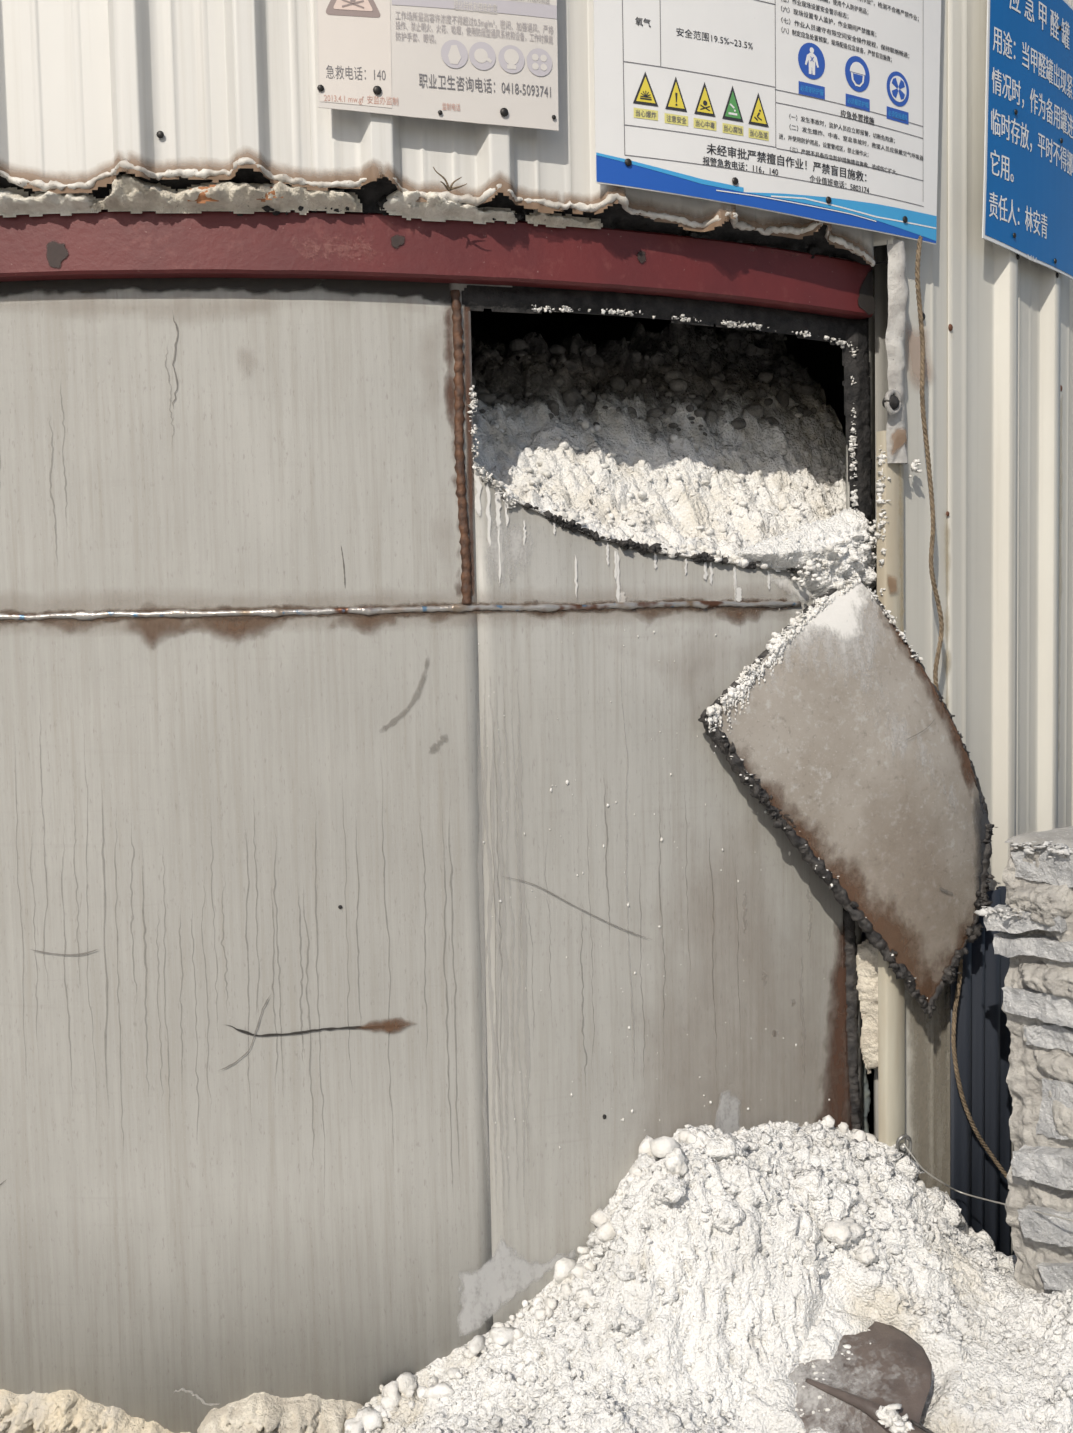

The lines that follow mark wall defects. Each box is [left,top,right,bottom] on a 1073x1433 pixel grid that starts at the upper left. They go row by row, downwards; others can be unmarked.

peeling [261,194,389,216]
rust [445,310,455,426]
leakage [474,469,527,584]
leakage [606,543,626,602]
leakage [684,559,713,585]
leakage [132,617,278,642]
leakage [350,615,394,629]
crack [221,996,409,1070]
rust [819,932,850,1129]